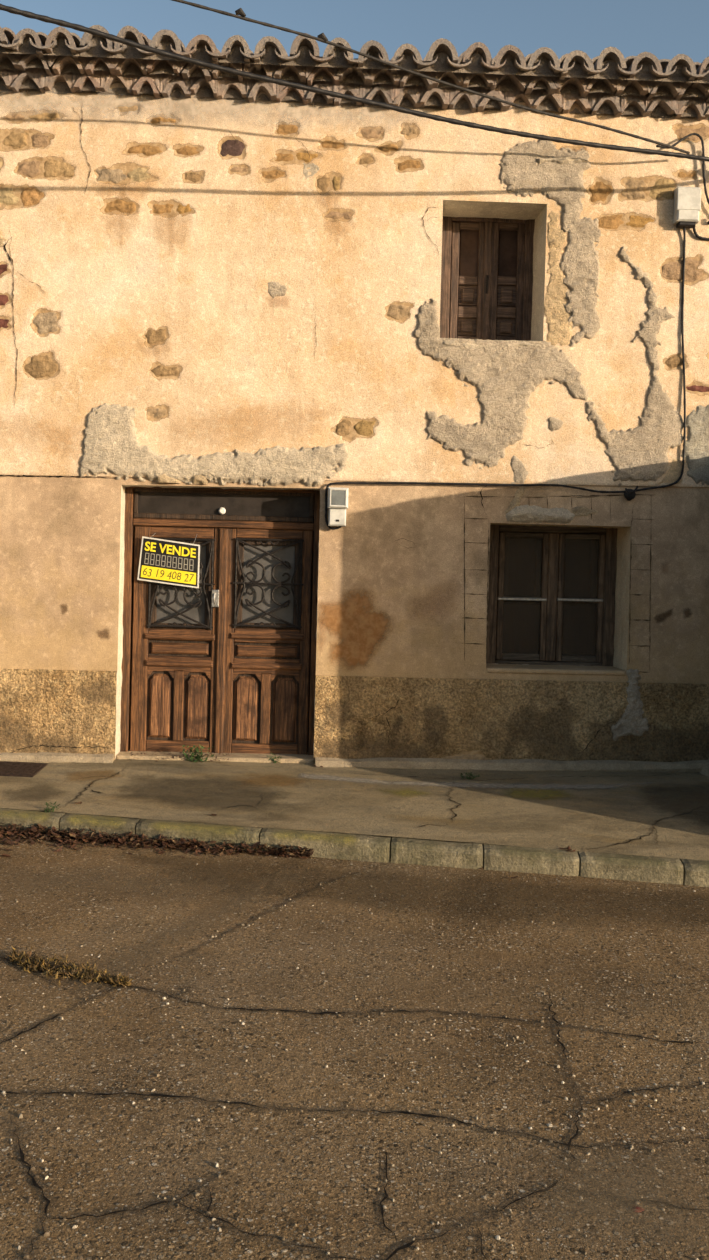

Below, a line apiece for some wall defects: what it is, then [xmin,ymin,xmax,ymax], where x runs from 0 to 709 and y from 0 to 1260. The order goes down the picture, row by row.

crack [4,237,43,405]
spalling [145,405,169,422]
peeling [155,474,208,484]